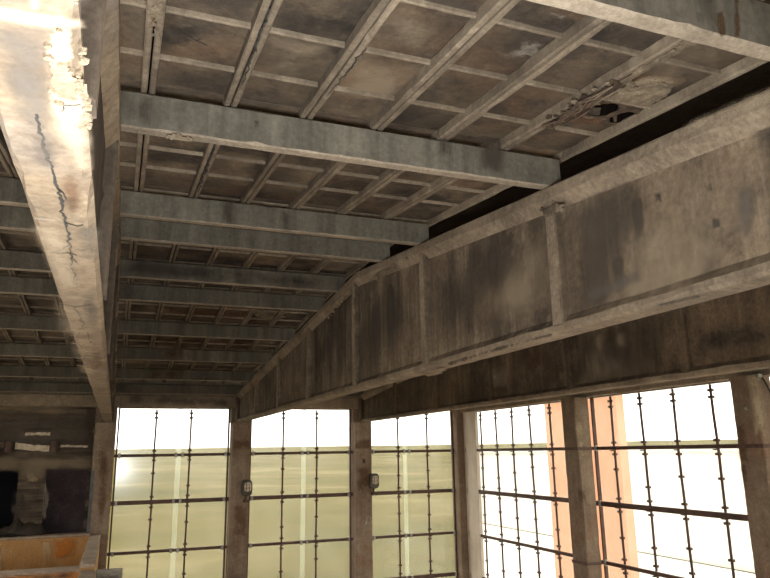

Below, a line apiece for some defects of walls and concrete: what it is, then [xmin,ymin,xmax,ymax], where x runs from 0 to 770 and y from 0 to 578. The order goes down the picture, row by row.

peeling [43,41,93,131]
spalling [541,40,697,130]
crack [35,114,83,286]